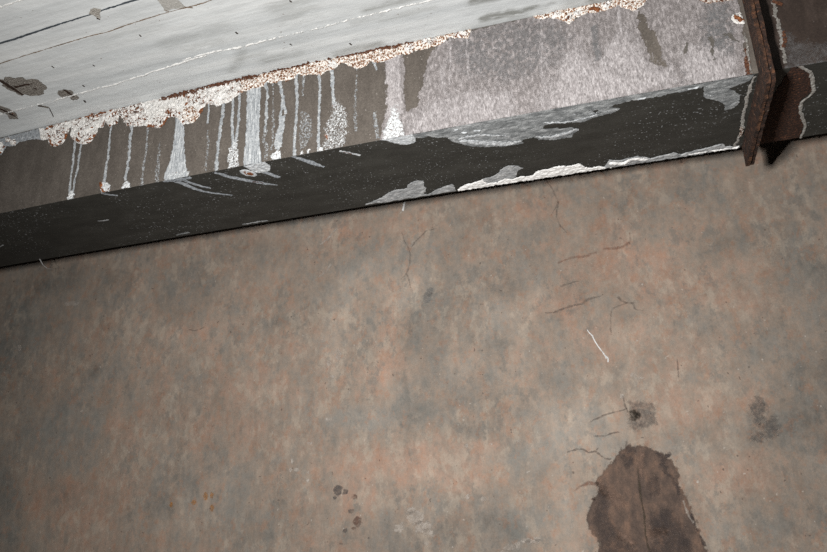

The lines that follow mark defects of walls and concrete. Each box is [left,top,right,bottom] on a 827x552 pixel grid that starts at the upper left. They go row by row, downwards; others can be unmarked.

crack [0,0,211,64]
corrosion [744,33,753,75]
spalling [0,106,18,119]
spalling [0,77,54,117]
spalling [57,89,86,103]
leakage [0,0,756,211]
corrosion [760,66,816,144]
leakage [587,445,707,552]